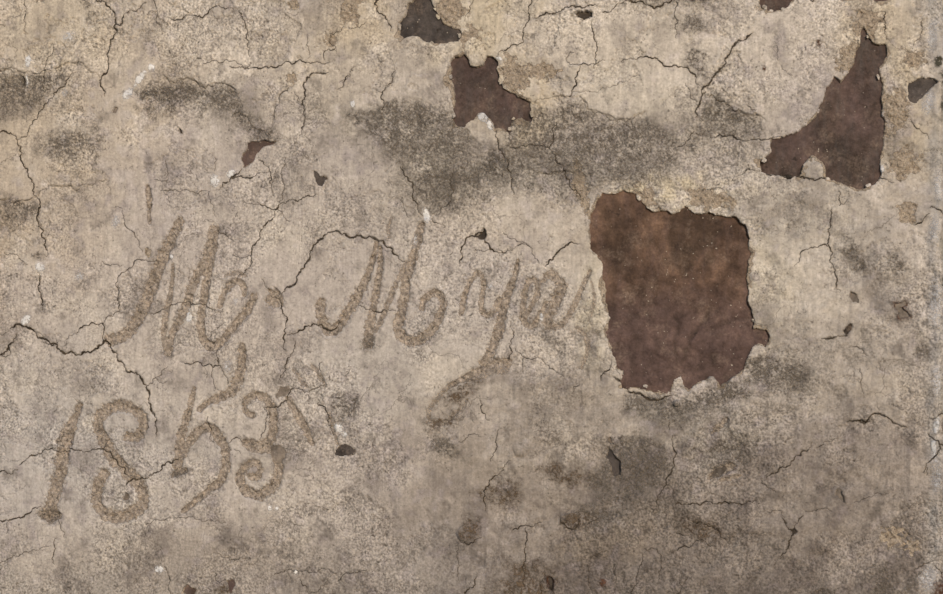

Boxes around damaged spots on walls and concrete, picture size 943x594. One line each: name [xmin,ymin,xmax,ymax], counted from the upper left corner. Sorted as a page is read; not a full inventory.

crack [0,44,229,437]
crack [96,0,392,136]
spalling [241,140,276,168]
crack [156,157,405,454]
spalling [394,0,563,135]
crack [459,232,577,265]
crack [501,0,783,147]
spalling [571,159,771,395]
crack [741,169,847,292]
spalling [754,0,937,191]
flaking render [895,202,917,224]
crack [0,439,182,485]